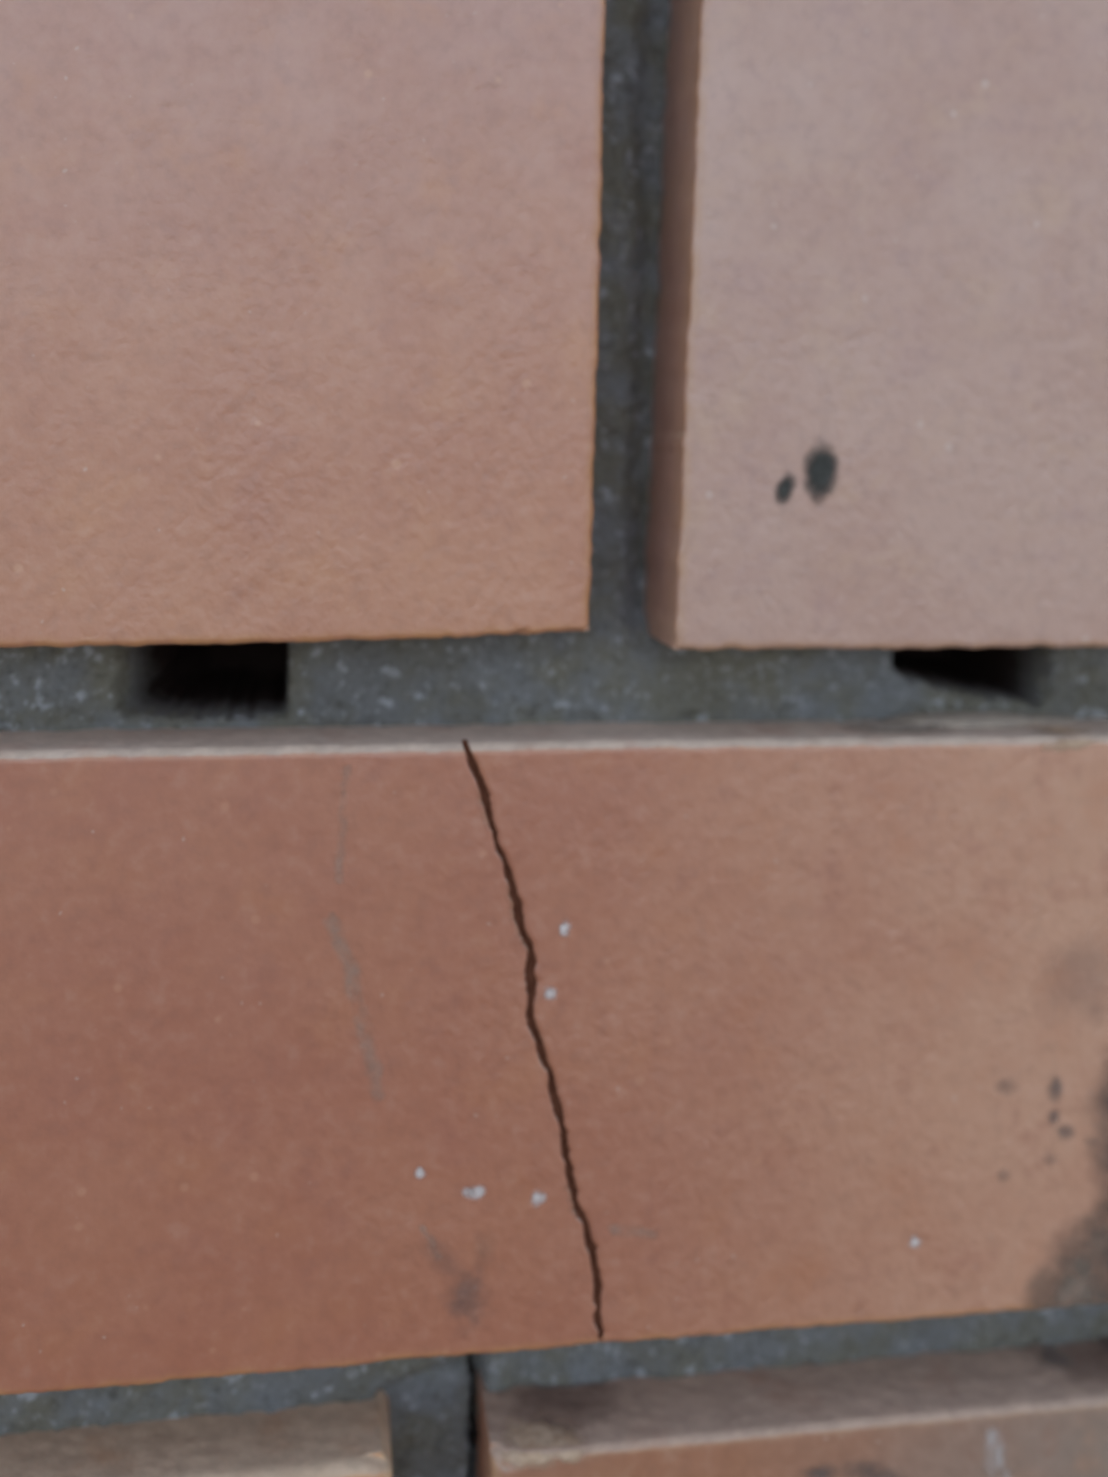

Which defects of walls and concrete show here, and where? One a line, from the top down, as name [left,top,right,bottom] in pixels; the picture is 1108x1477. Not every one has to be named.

damp [777,450,836,501]
crack [462,739,604,1339]